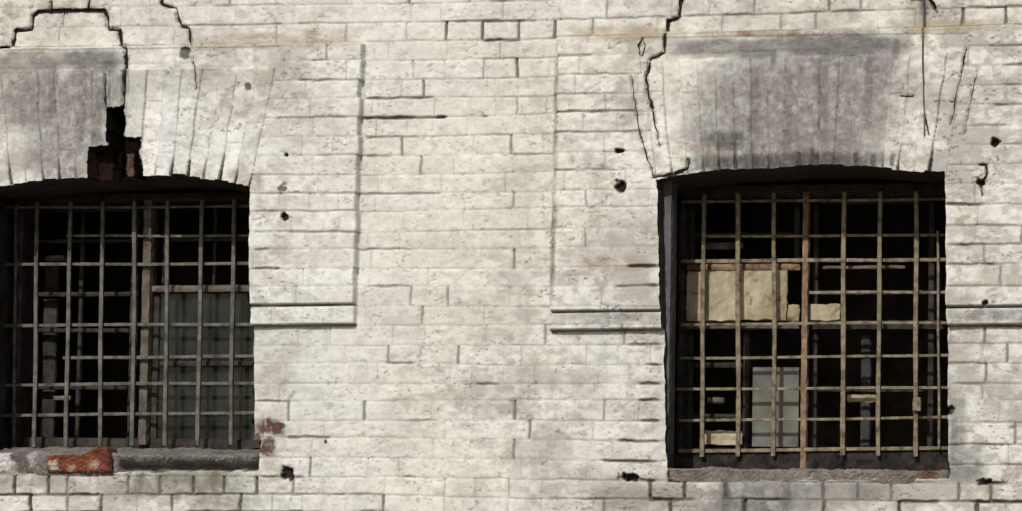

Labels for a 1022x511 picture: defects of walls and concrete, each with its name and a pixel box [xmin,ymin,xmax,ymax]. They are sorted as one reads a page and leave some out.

crack [0,0,128,108]
crack [160,0,197,90]
crack [632,0,690,178]
crack [900,48,978,135]
spalling [112,110,154,182]
spalling [47,447,118,473]
peeling [255,418,284,456]